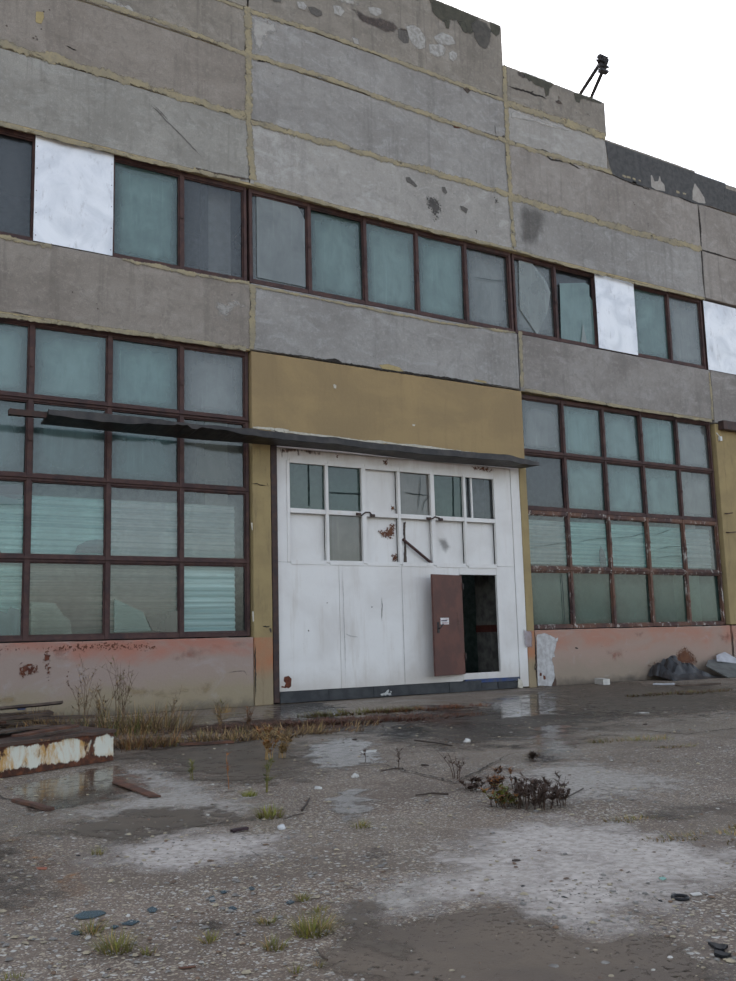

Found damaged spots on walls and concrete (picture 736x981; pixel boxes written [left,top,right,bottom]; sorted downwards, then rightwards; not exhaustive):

spalling [297,2,322,16]
peeling [397,25,457,61]
peeling [651,175,665,191]
spalling [427,187,454,220]
peeling [692,184,706,204]